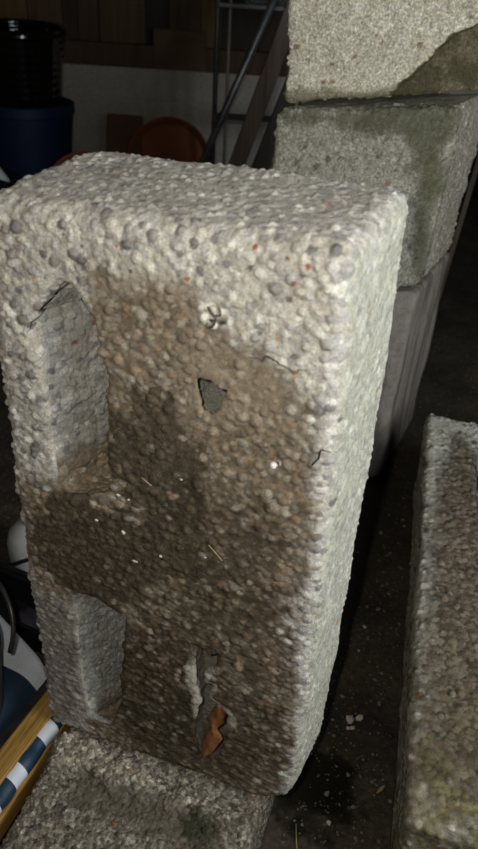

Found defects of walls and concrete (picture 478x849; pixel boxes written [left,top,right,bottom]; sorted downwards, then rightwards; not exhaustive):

spalling [391,23,478,96]
crack [27,283,86,333]
leakage [200,302,229,329]
spalling [27,278,110,489]
spalling [197,378,227,414]
crack [248,356,307,372]
spalling [74,593,126,725]
spalling [184,643,236,757]